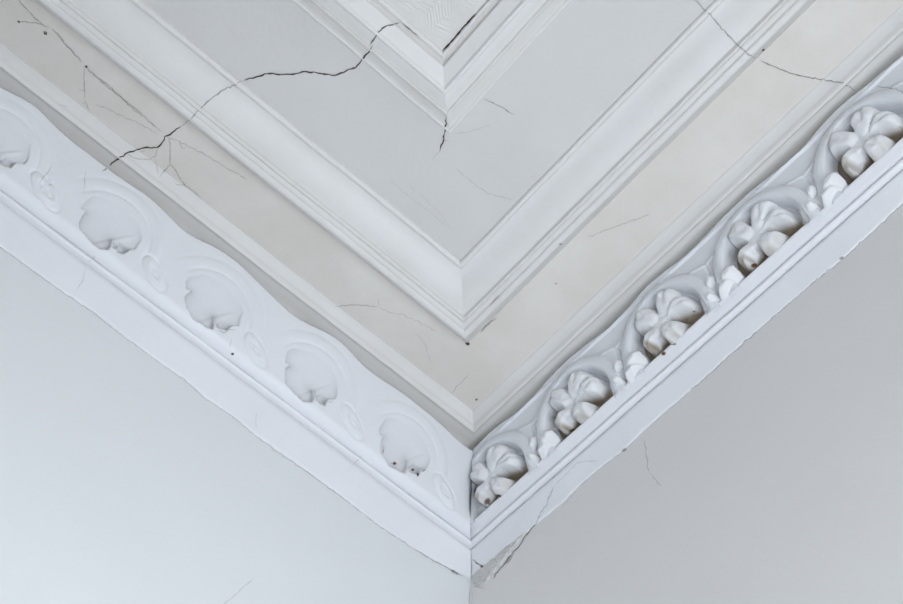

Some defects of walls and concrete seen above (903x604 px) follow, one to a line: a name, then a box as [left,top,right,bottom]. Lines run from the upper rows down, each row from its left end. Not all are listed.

crack [105,23,416,170]
crack [443,14,476,51]